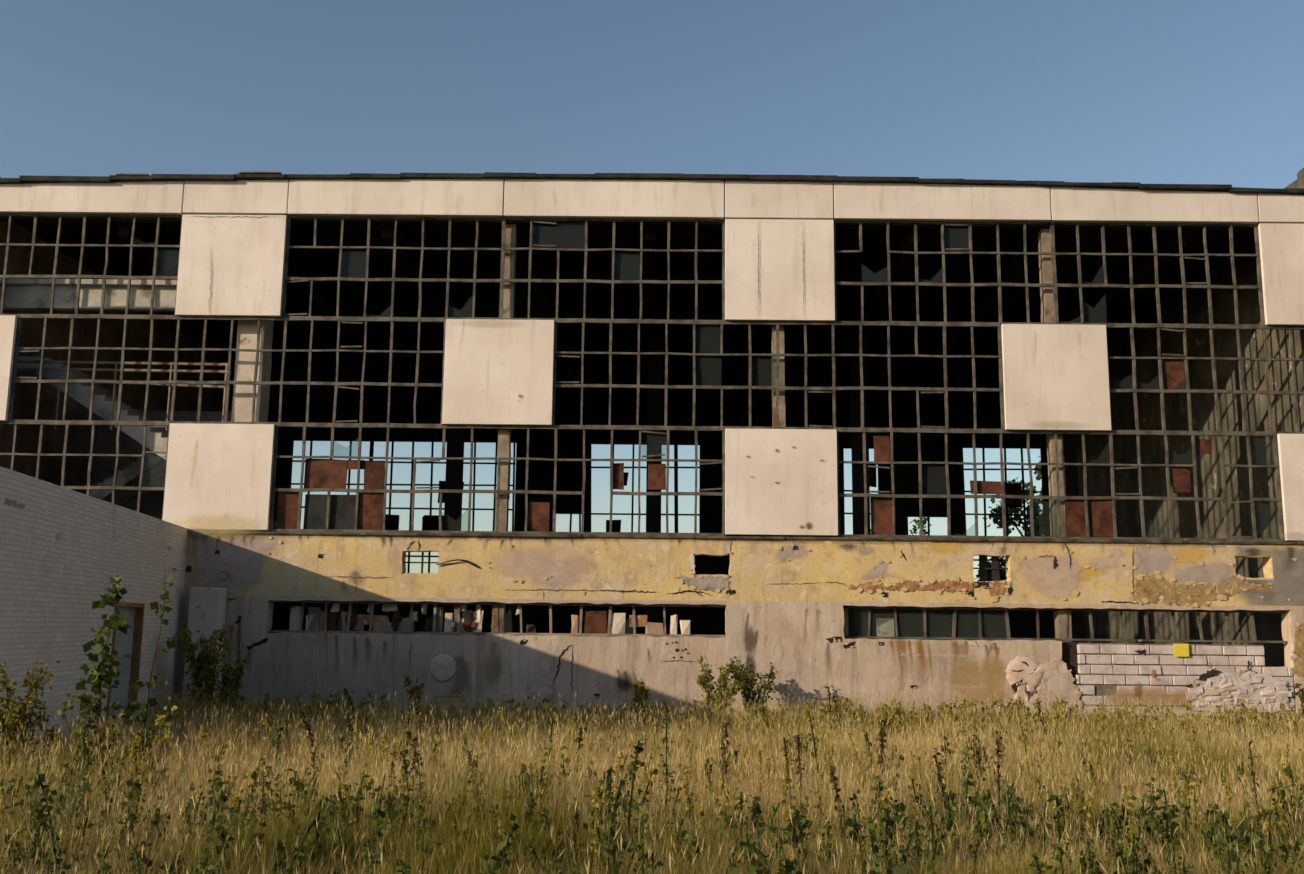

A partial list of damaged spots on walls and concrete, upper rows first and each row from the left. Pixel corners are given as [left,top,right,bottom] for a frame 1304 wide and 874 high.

spalling [676,553,736,595]
spalling [848,547,1013,602]
crack [550,644,573,695]
leakage [441,598,758,684]
rust [890,640,930,660]
spalling [1020,545,1304,714]